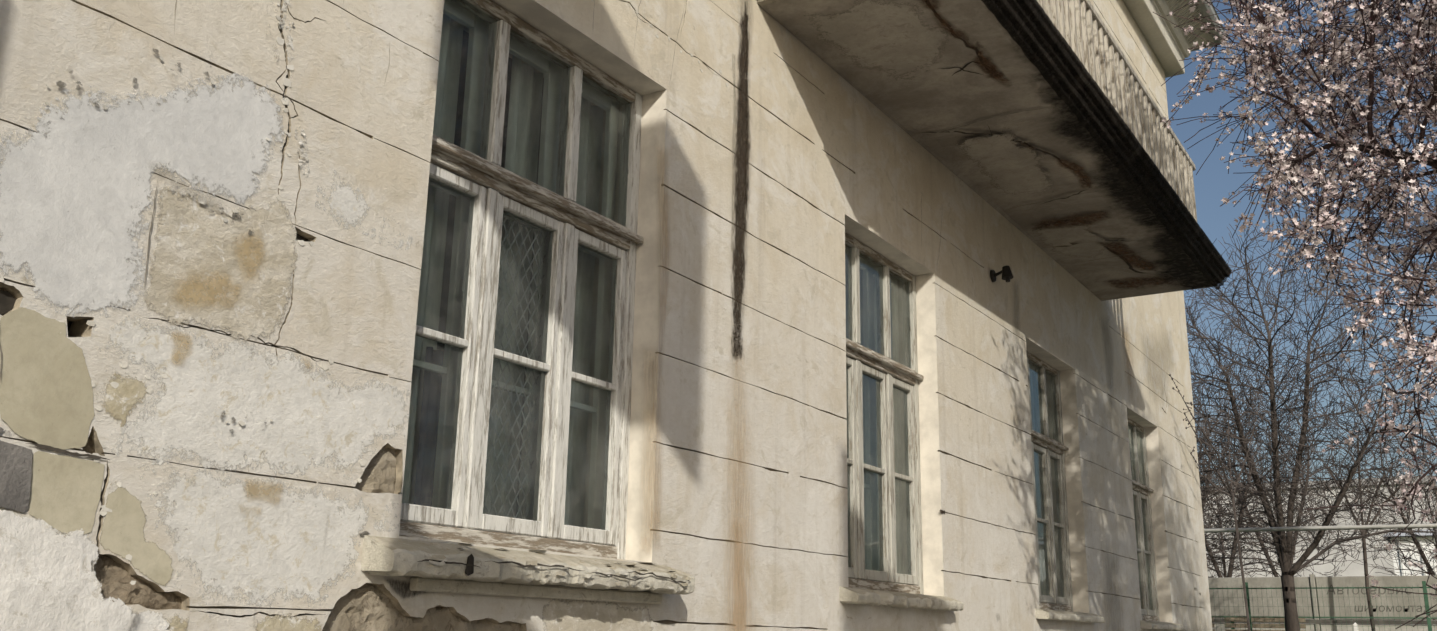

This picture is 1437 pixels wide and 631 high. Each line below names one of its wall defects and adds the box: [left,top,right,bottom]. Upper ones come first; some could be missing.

crack [271,0,344,211]
damp [731,3,750,357]
damp [983,0,1232,290]
peeling [0,186,521,631]
peeling [542,599,655,631]